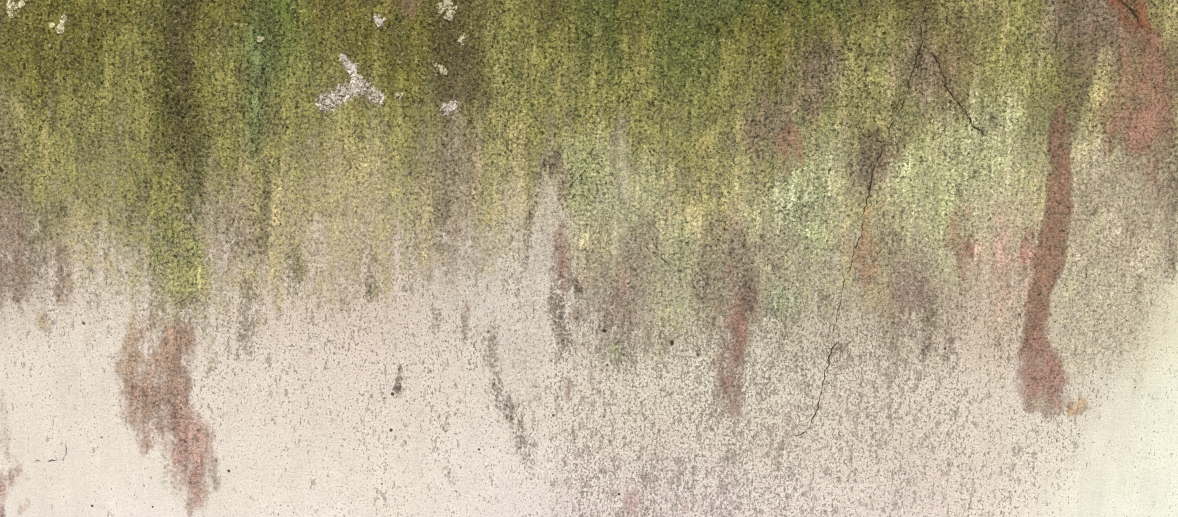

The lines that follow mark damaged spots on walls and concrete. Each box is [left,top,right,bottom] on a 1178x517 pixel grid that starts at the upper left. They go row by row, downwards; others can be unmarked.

leakage [128,0,209,306]
leakage [225,18,274,259]
leakage [490,109,526,173]
leakage [524,138,601,281]
leakage [609,121,632,270]
leakage [773,167,827,239]
leakage [856,125,912,189]
crack [795,1,983,436]
corrosion [948,0,1178,417]
corrosion [116,322,217,515]
leakage [485,324,541,459]
leakage [551,295,571,350]